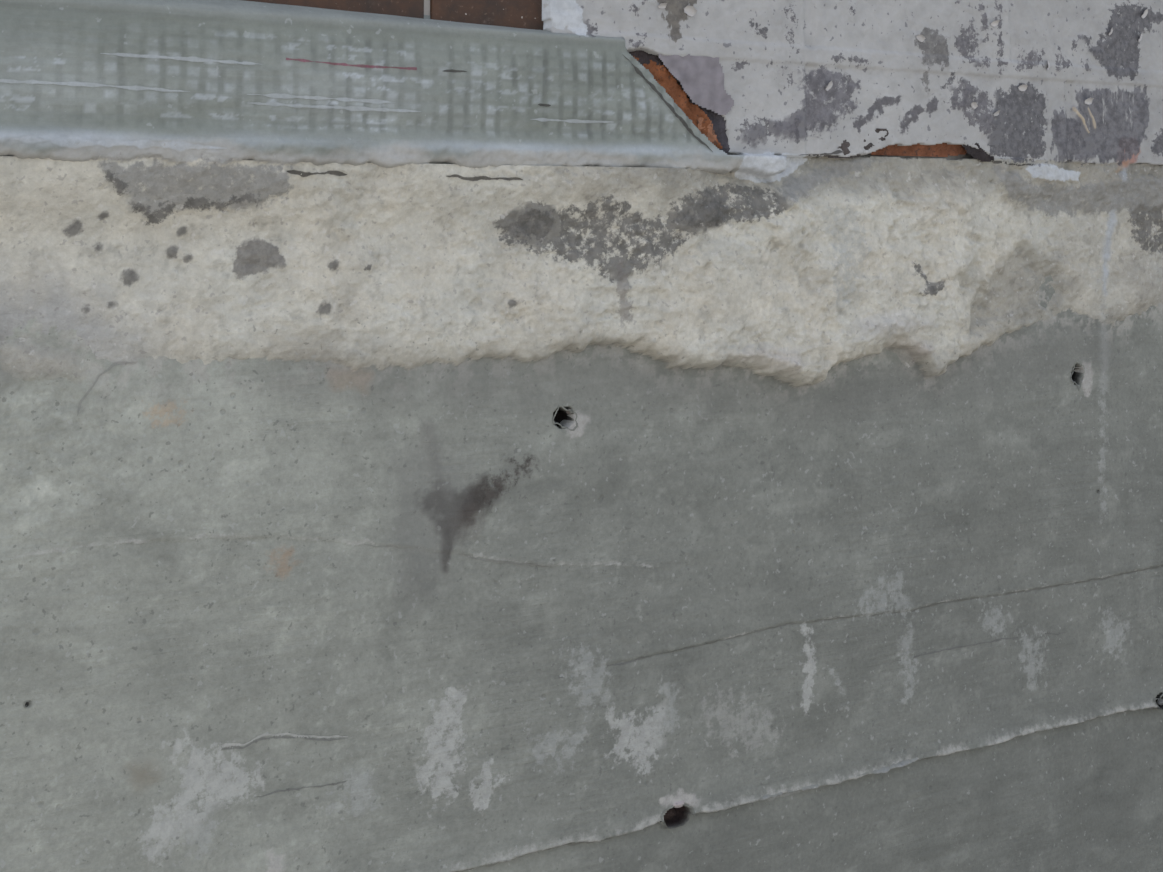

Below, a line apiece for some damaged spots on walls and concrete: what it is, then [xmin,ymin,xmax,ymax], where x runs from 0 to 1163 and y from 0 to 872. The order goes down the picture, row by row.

spalling [0,0,1163,369]
leakage [245,145,1163,626]
crack [607,562,1163,667]
leakage [848,559,925,716]
leakage [972,587,1056,695]
leakage [1090,603,1138,676]
leakage [130,722,273,872]
crack [216,732,348,752]
crack [257,780,347,797]
leakage [314,758,387,830]
leakage [407,605,852,834]